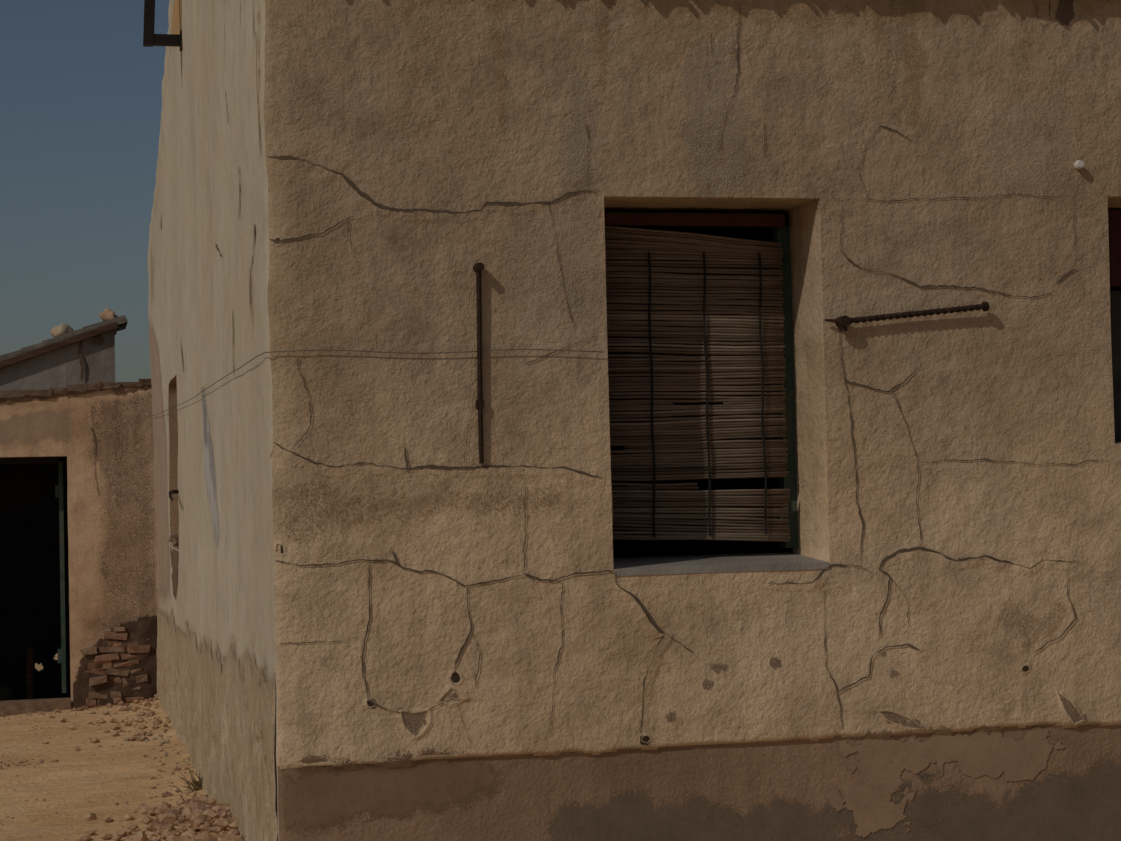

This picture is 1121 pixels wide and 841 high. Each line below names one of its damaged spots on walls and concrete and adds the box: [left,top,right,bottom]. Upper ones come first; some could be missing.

crack [232,33,601,375]
crack [711,5,740,152]
crack [838,125,1079,298]
flaking render [0,385,151,404]
flaking render [71,547,515,841]
crack [270,359,692,742]
leakage [542,750,1121,841]
crack [766,331,1109,728]